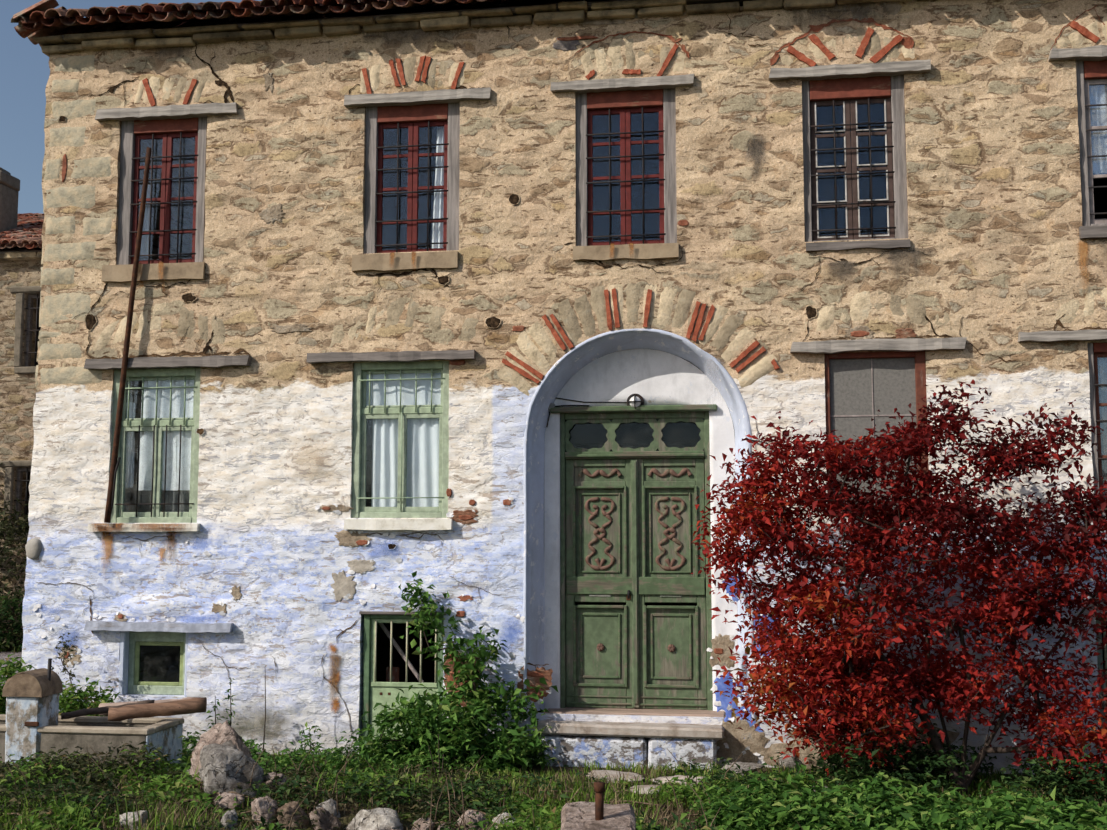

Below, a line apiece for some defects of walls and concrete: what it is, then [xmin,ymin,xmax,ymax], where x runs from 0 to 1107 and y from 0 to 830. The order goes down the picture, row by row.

crack [79,61,147,106]
crack [195,46,243,104]
crack [72,266,250,359]
spalling [315,503,354,515]
corrosion [93,523,124,561]
corrosion [137,524,185,560]
spalling [330,530,402,602]
spalling [93,612,151,622]
spalling [164,586,242,623]
corrosion [329,645,341,713]
spalling [706,634,960,770]